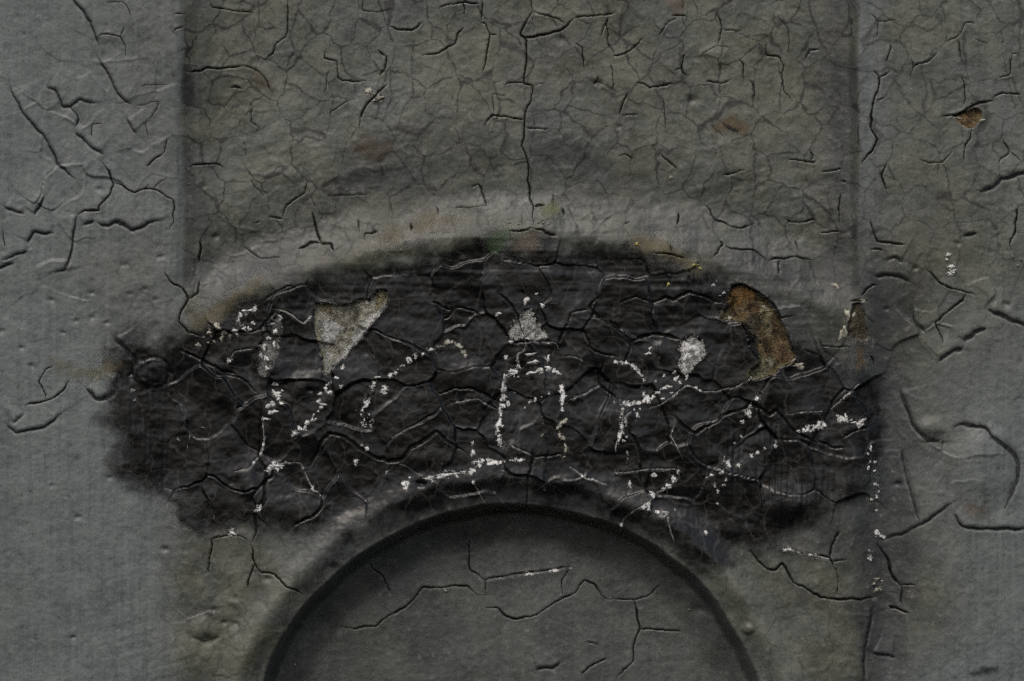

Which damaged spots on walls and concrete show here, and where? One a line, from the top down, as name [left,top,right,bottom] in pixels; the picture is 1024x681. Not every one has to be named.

crack [78,84,175,229]
crack [362,0,818,236]
crack [706,15,1021,272]
crack [164,241,467,594]
peeling [291,290,389,439]
damp [106,238,883,567]
peeling [494,293,569,460]
crack [432,212,875,543]
peeling [613,335,707,464]
rust [721,284,804,381]
crack [341,540,680,677]
crack [750,532,913,613]